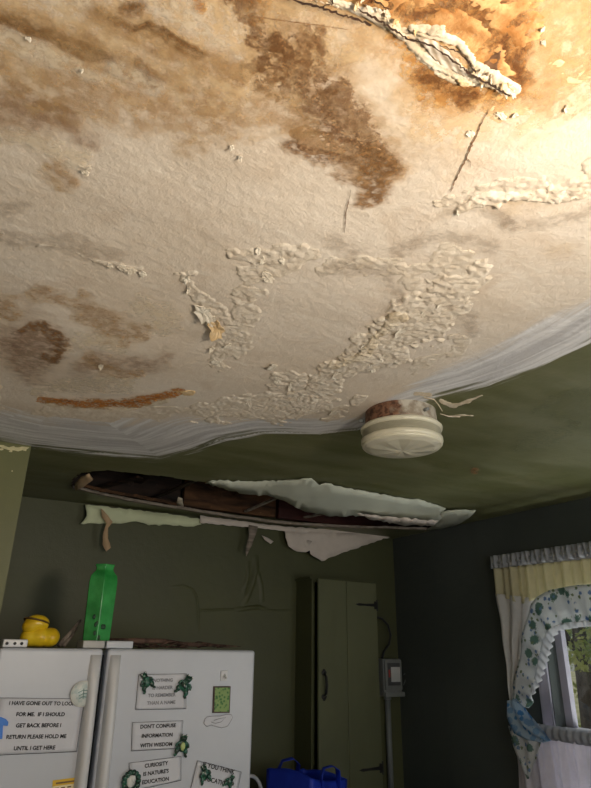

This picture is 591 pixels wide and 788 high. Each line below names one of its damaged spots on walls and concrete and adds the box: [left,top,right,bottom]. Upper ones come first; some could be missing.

damp [0,0,404,208]
crack [244,0,521,100]
crack [451,112,488,191]
damp [410,0,591,136]
peeling [480,103,531,123]
flaking render [432,156,591,217]
flaking render [31,242,494,426]
spalling [75,474,93,491]